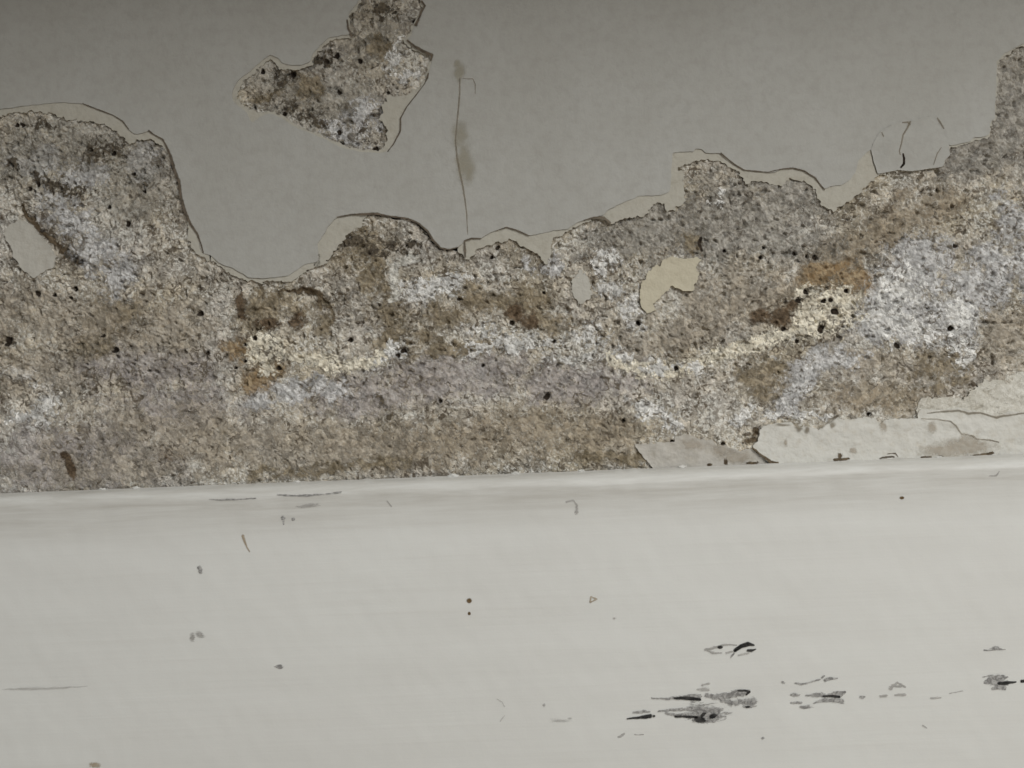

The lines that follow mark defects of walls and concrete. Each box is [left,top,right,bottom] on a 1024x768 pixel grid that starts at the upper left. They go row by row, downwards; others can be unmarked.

flaking render [232,0,432,153]
crack [338,78,529,258]
flaking render [0,44,1024,493]